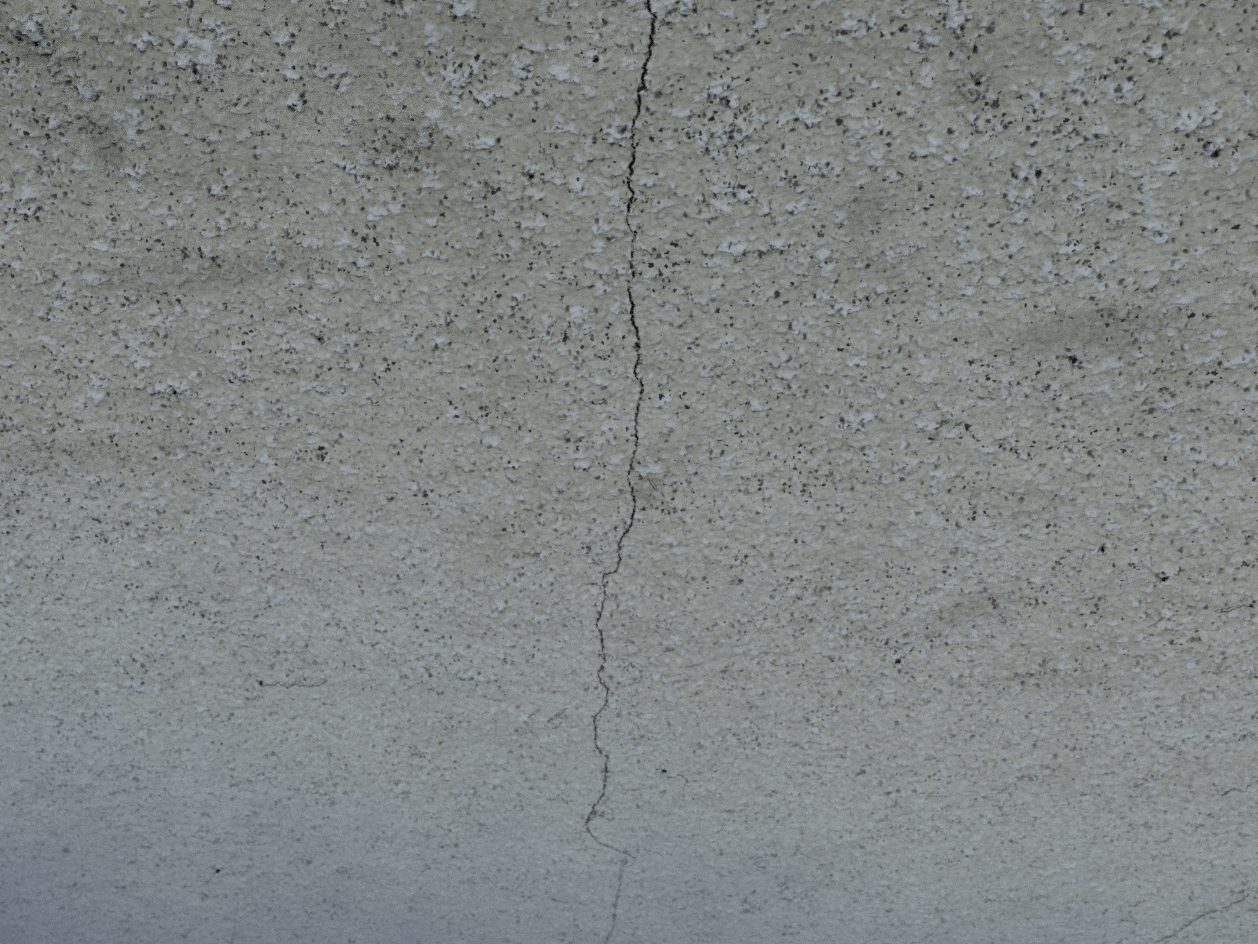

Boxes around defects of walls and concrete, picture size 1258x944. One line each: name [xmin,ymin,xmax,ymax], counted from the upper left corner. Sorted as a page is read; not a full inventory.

crack [528,0,658,942]